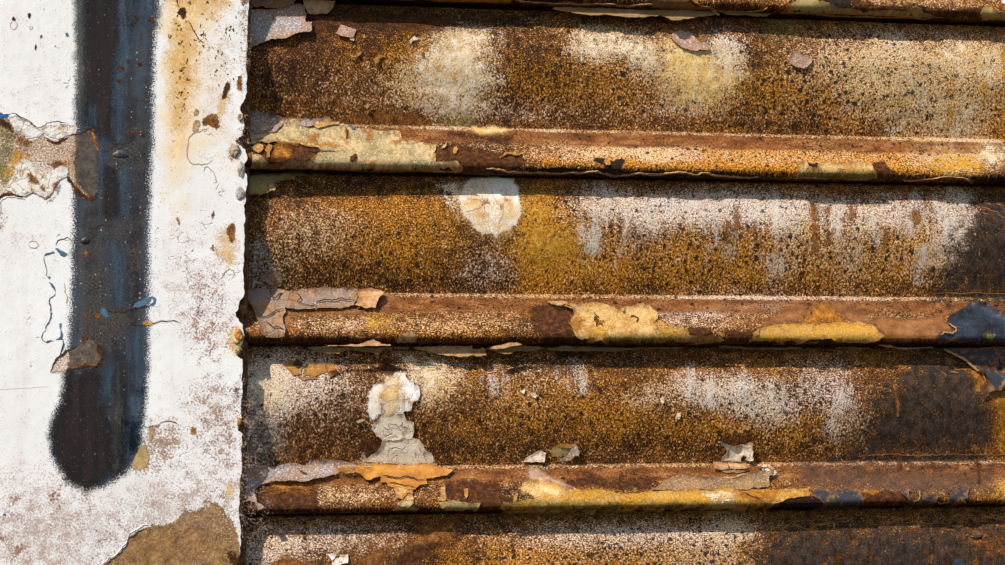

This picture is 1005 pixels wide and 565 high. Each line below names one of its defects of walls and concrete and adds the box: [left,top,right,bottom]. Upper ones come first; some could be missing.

peeling [168,0,335,132]
peeling [0,111,99,215]
peeling [249,110,525,239]
corrosion [340,107,755,178]
corrosion [528,303,580,346]
corrosion [687,300,953,350]
peeling [244,331,480,565]
corrosion [444,479,514,511]
corrosion [565,472,661,493]
peeling [498,441,864,519]
peeling [101,498,241,565]
corrosion [766,497,858,565]